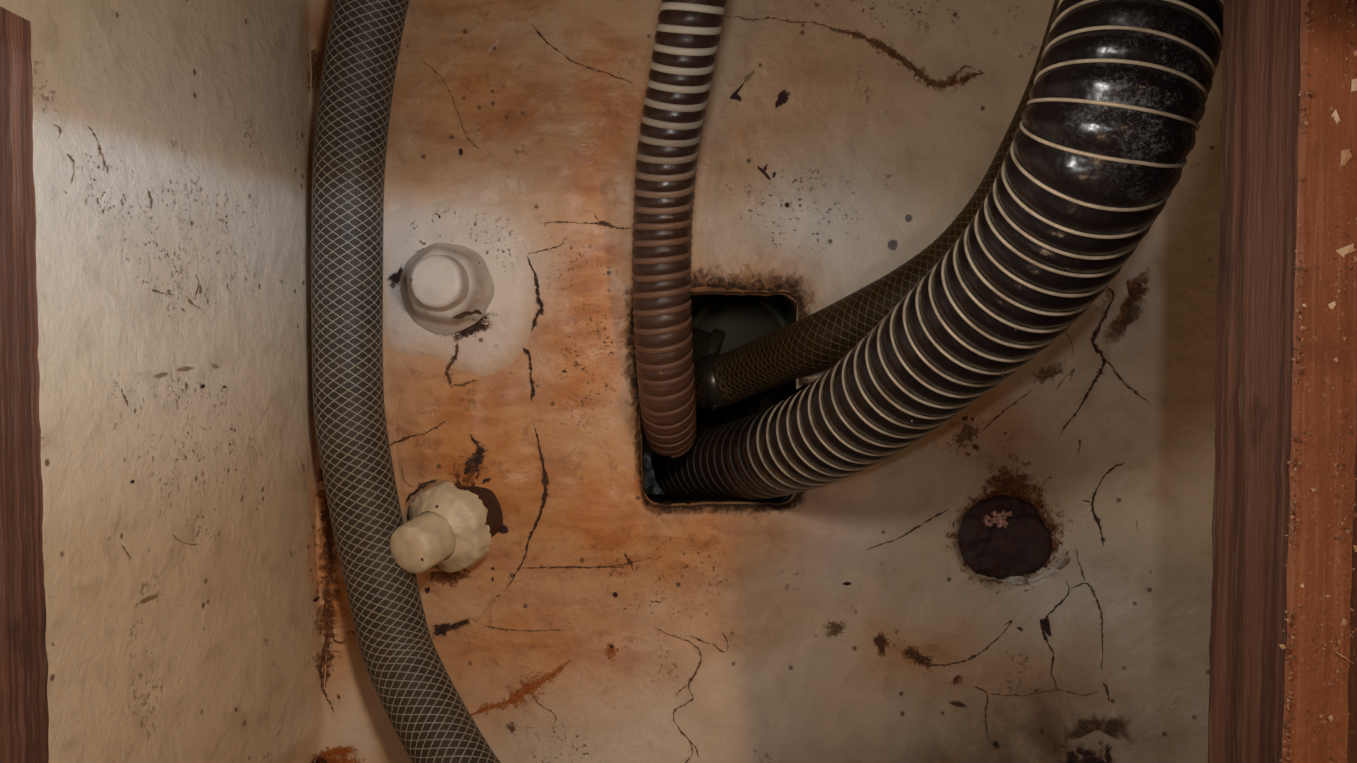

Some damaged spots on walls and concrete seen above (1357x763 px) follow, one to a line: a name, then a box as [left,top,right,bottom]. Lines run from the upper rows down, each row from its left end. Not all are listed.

crack [723,16,985,91]
corrosion [388,267,403,288]
corrosion [437,313,493,388]
crack [496,215,648,597]
crack [981,287,1147,455]
corrosion [405,434,491,502]
corrosion [425,569,470,594]
crack [905,463,1124,749]
corrosion [471,660,571,732]
crack [656,628,728,763]
corrosion [311,746,364,763]
water stain [1057,716,1128,763]